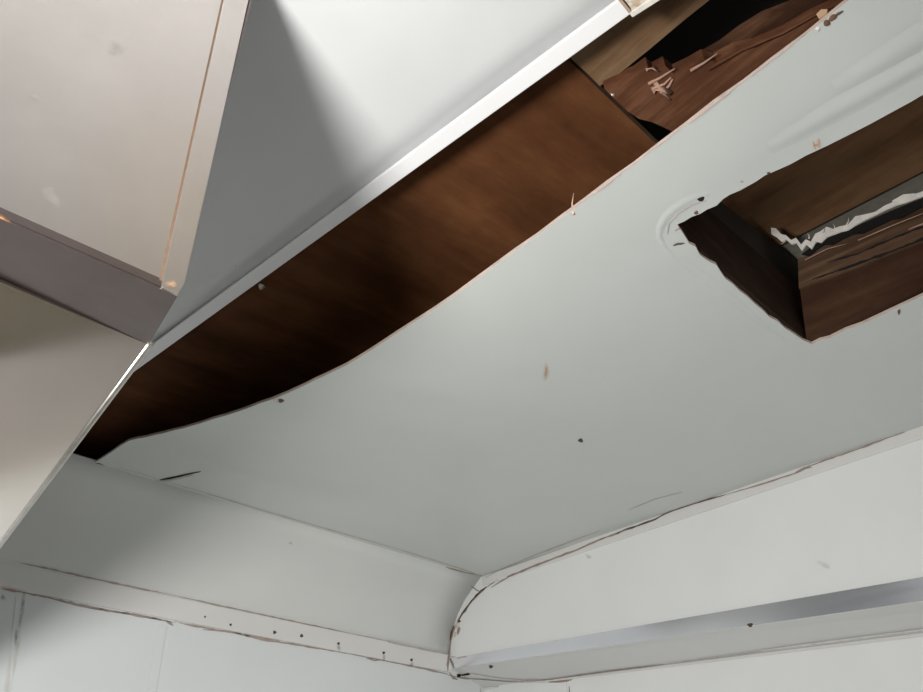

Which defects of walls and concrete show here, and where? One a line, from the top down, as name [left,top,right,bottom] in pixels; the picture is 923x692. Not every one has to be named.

peeling [815,9,843,31]